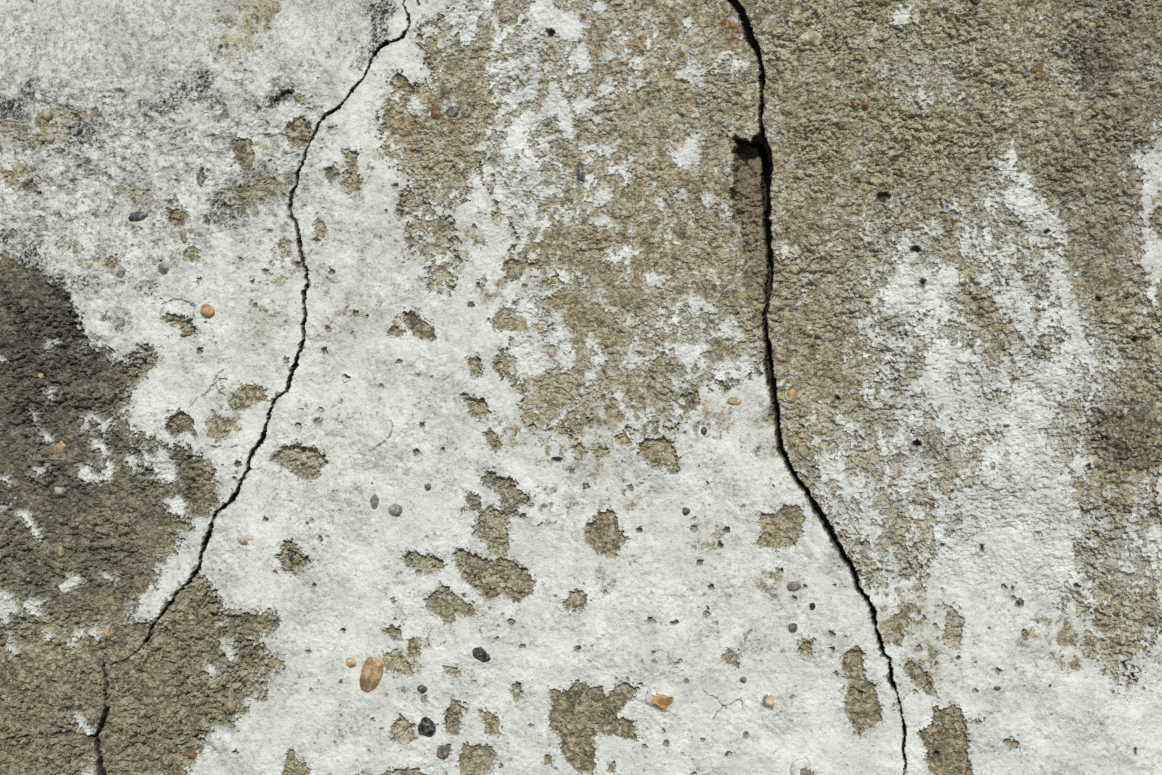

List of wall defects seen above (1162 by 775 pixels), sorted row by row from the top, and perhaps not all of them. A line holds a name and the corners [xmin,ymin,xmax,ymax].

peeling [103,253,119,270]
peeling [182,246,202,261]
crack [0,0,411,775]
peeling [381,0,1162,686]
crack [717,0,908,775]
spalling [270,441,330,482]
peeling [0,256,282,775]
peeling [543,679,640,775]
crack [701,689,745,722]
peeling [841,645,884,741]
peeling [902,659,985,775]